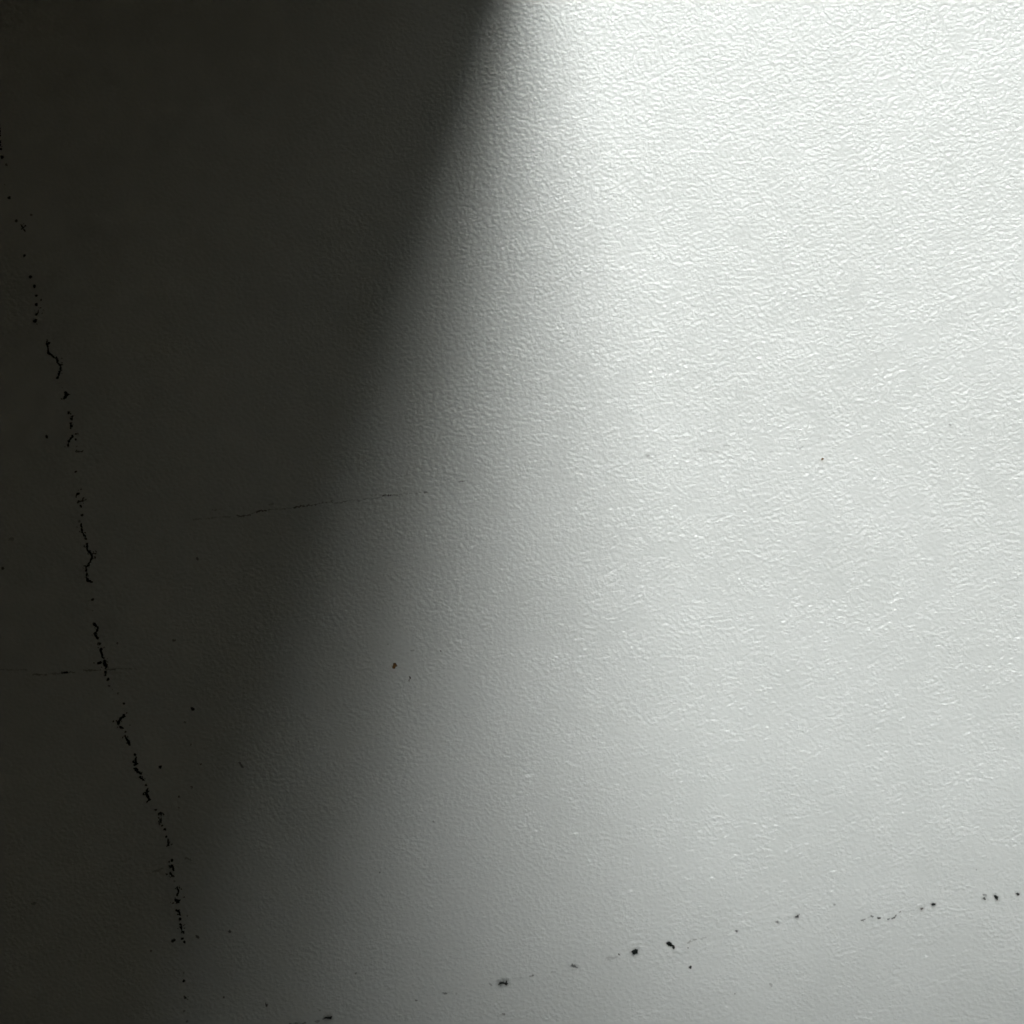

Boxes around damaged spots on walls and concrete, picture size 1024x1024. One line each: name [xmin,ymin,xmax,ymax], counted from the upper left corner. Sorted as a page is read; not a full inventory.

crack [7,196,186,943]